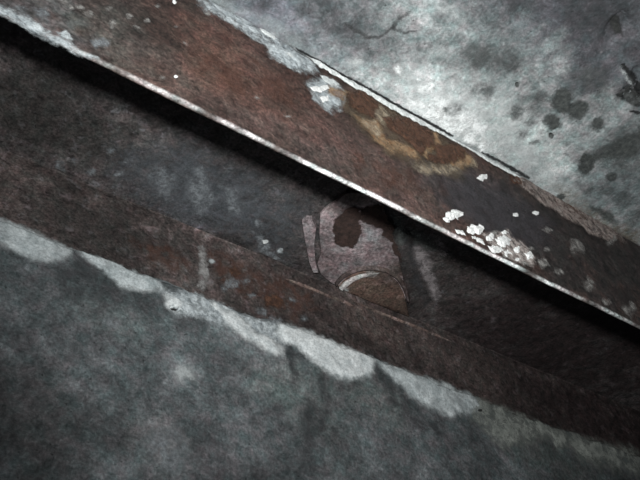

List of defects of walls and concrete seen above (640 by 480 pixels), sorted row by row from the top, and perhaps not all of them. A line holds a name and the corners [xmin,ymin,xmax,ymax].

crack [345,14,412,39]
rust [329,87,476,174]
leakage [307,56,574,200]
leakage [537,89,588,138]
leakage [592,117,603,131]
leakage [579,126,640,174]
leakage [452,183,547,245]
leakage [0,218,640,473]